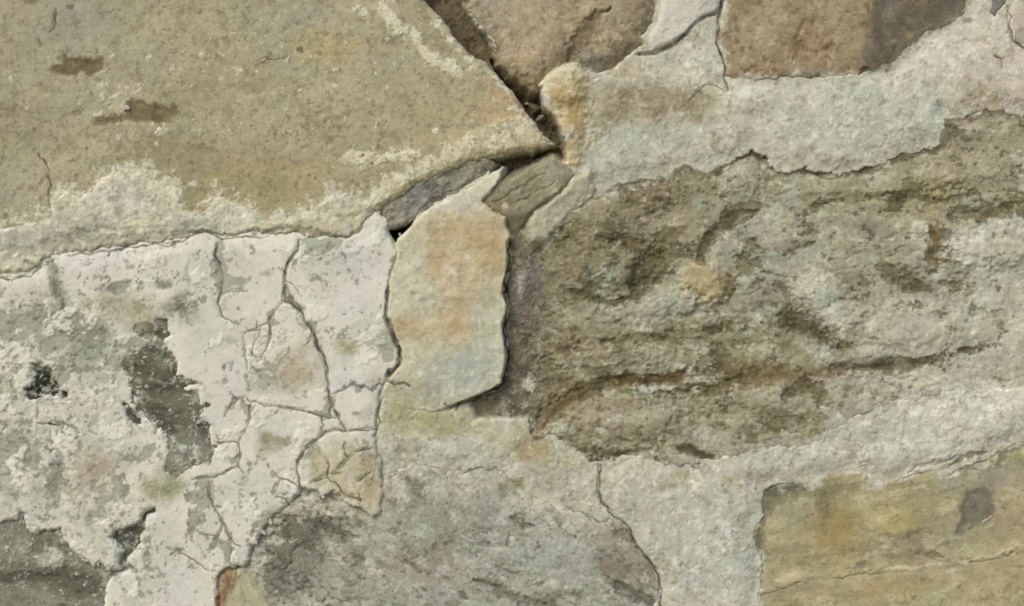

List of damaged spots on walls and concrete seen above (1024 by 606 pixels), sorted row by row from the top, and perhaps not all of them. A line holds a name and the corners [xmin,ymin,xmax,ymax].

crack [636,0,728,104]
flaking render [26,364,68,402]
flaking render [119,318,218,478]
crack [0,230,409,571]
crack [446,238,511,411]
flaking render [0,508,156,606]
crack [567,463,661,604]